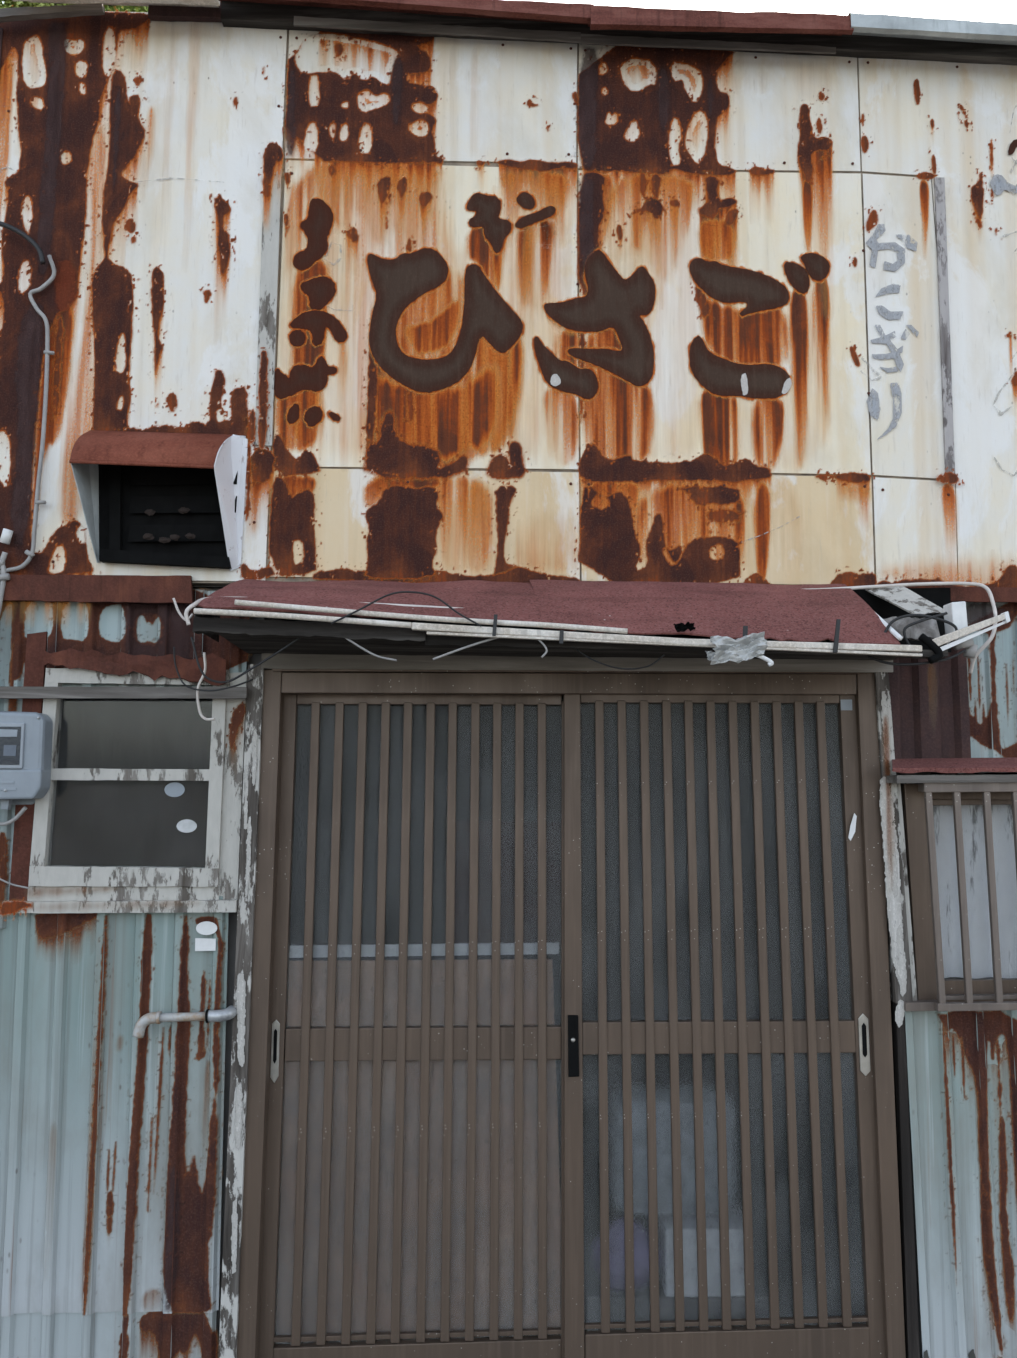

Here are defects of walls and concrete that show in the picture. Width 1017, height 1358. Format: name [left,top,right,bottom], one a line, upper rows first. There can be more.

corrosion [0,5,834,584]
corrosion [816,468,875,508]
corrosion [830,559,1017,588]
corrosion [937,467,965,531]
peeling [881,691,889,742]
corrosion [966,603,1017,758]
peeling [244,729,257,901]
peeling [879,776,907,1027]
corrosion [0,832,225,1358]
peeling [235,1083,243,1150]
peeling [236,973,246,1067]
corrosion [938,1011,1017,1358]